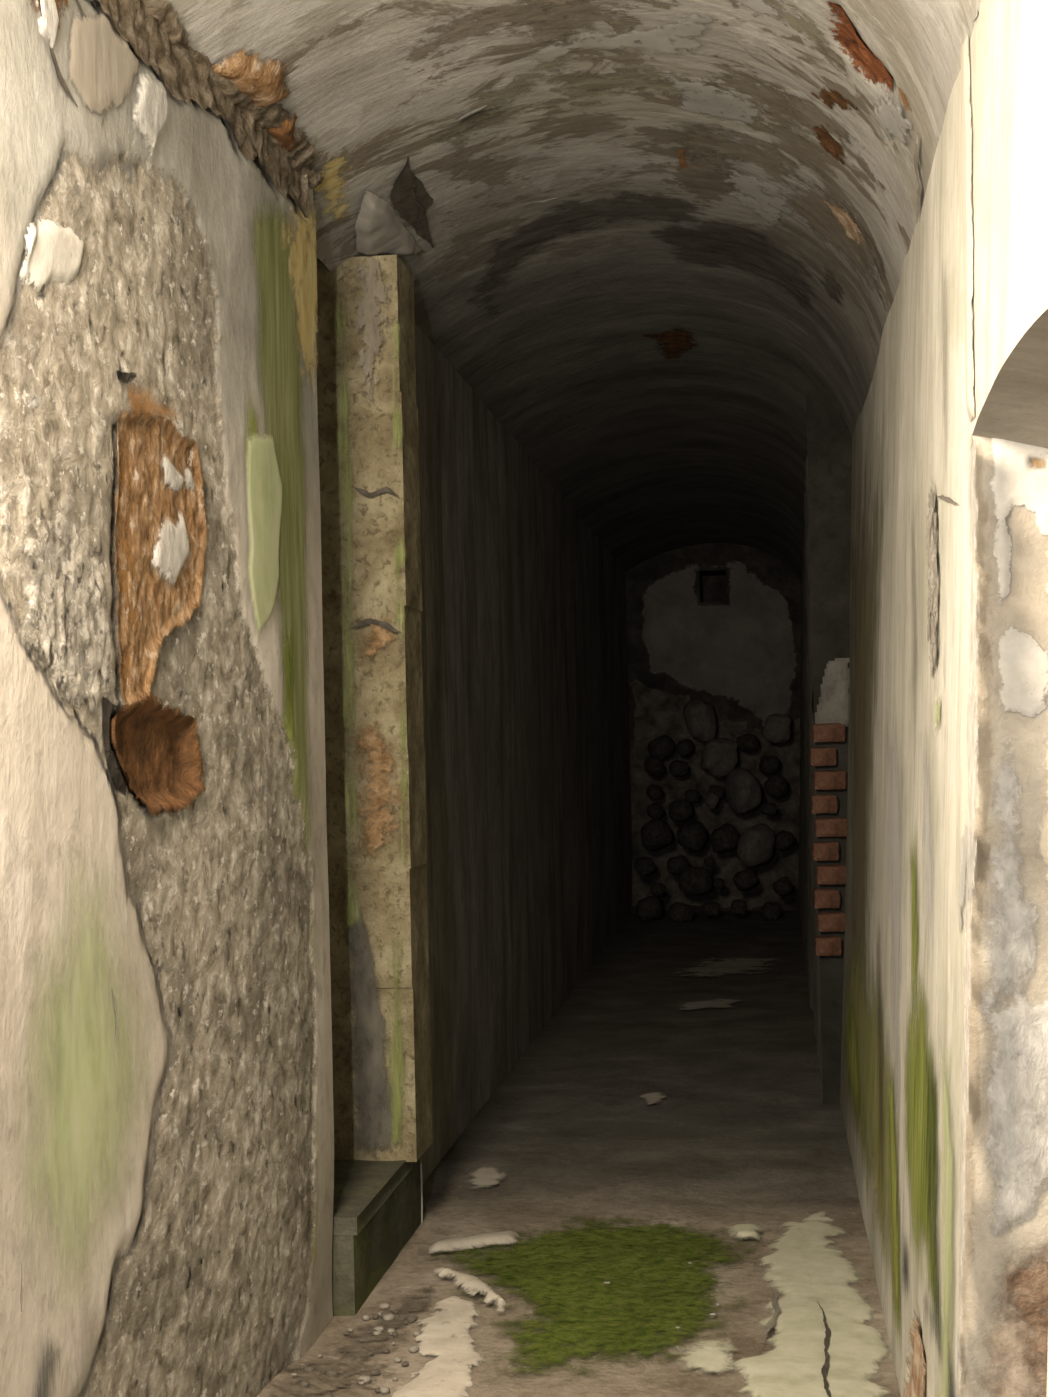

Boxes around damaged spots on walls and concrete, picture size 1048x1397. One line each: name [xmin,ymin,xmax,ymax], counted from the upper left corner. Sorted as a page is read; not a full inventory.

flaking render [404,0,912,318]
spalling [0,0,324,1397]
spalling [345,905,393,1151]
flaking render [956,433,1048,1397]
crack [762,1286,781,1340]
crack [817,1301,831,1397]
leakage [926,1068,953,1397]